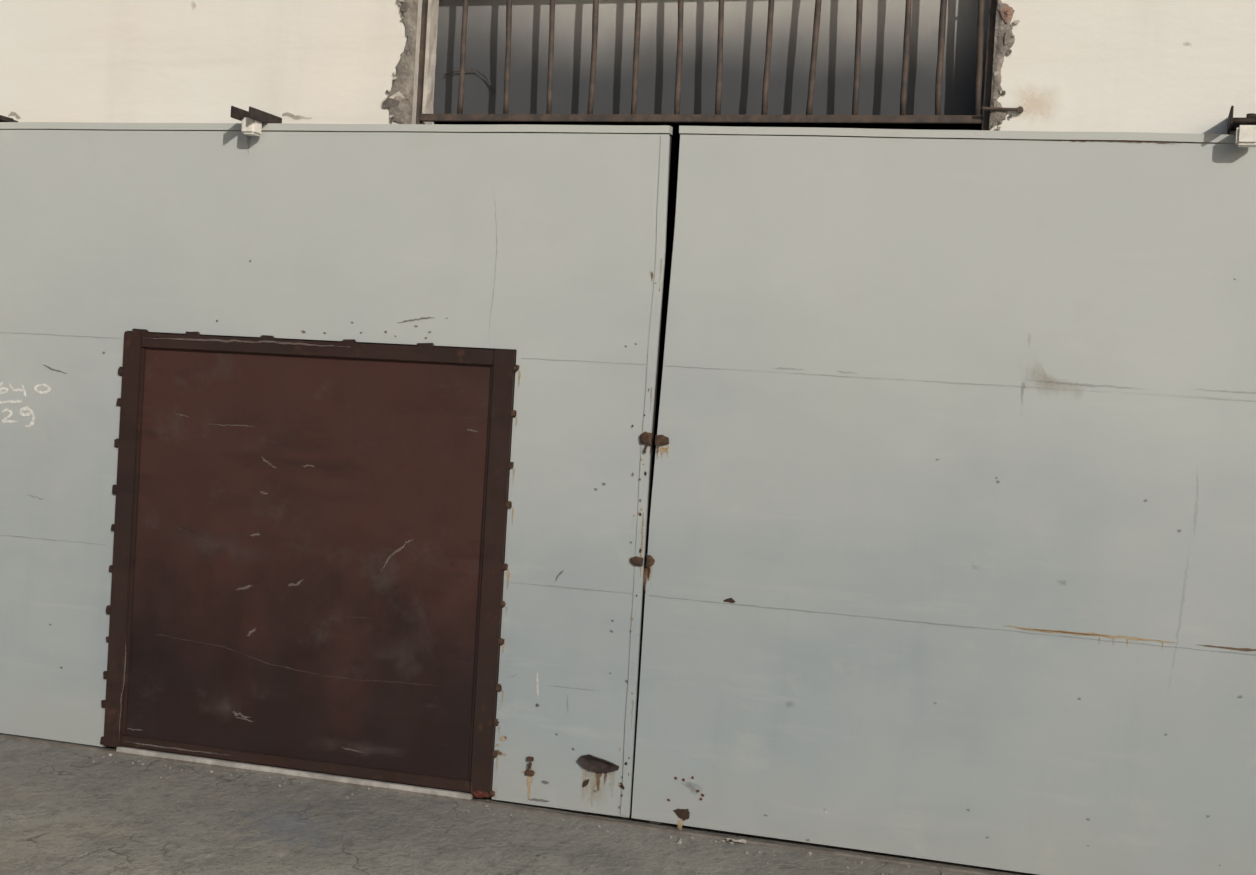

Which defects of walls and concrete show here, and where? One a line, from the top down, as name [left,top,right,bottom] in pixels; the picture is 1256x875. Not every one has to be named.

flaking render [382,0,418,124]
flaking render [989,0,1020,130]
corrosion [630,499,652,597]
corrosion [1009,626,1173,646]
corrosion [667,799,690,829]